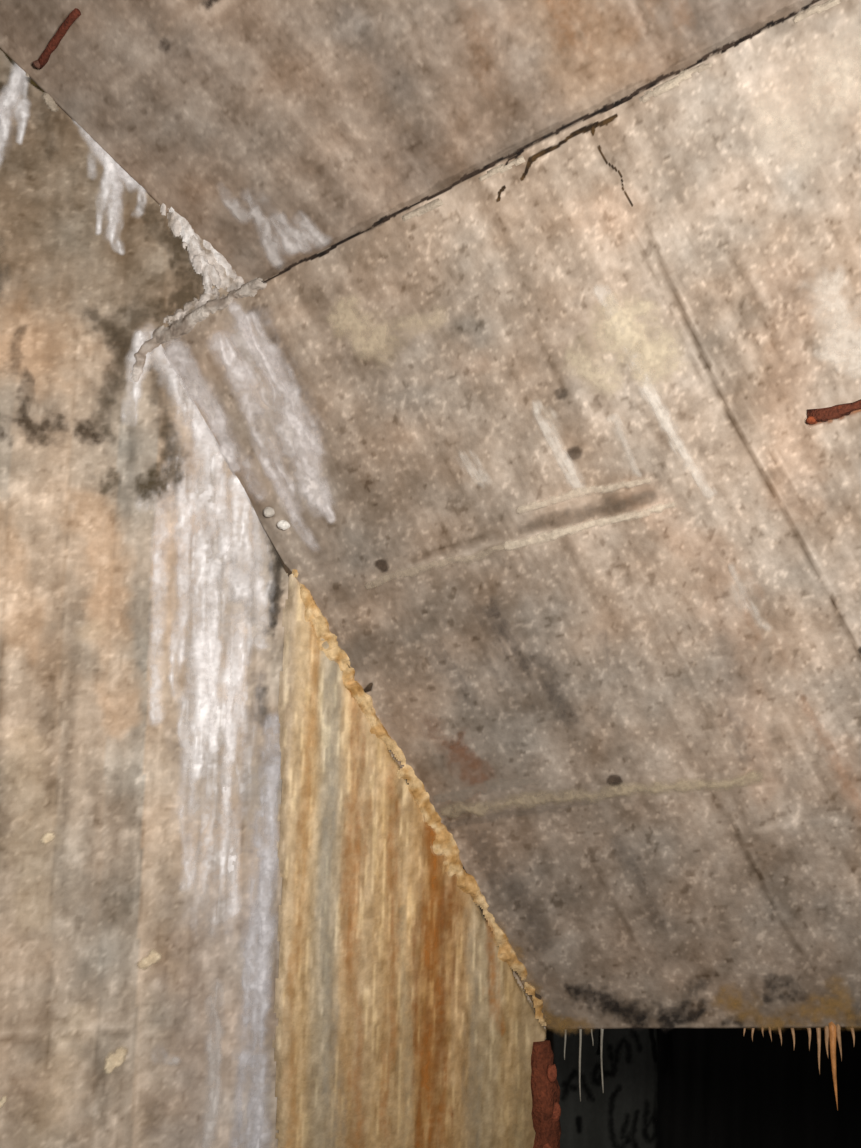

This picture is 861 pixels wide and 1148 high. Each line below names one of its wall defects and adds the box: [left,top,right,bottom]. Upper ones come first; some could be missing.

damp [0,68,28,143]
crack [0,48,59,112]
damp [86,133,145,253]
crack [261,0,841,283]
damp [18,413,49,435]
damp [130,197,334,889]
damp [243,758,278,1033]
corrosion [416,826,452,1148]
damp [239,1053,269,1148]
corrosion [547,1064,557,1083]